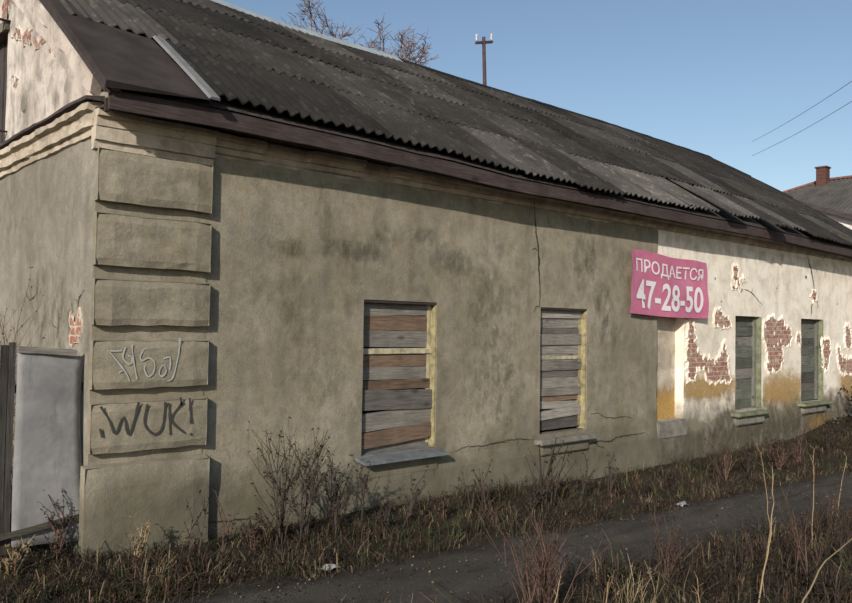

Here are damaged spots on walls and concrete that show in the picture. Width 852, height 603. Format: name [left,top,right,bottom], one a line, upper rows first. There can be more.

flaking render [0,0,15,23]
flaking render [11,25,55,57]
crack [533,203,541,309]
flaking render [731,263,747,295]
flaking render [68,307,83,347]
flaking render [683,300,732,387]
flaking render [761,313,802,377]
flaking render [820,321,852,377]
crack [457,435,534,451]
crack [590,413,645,448]